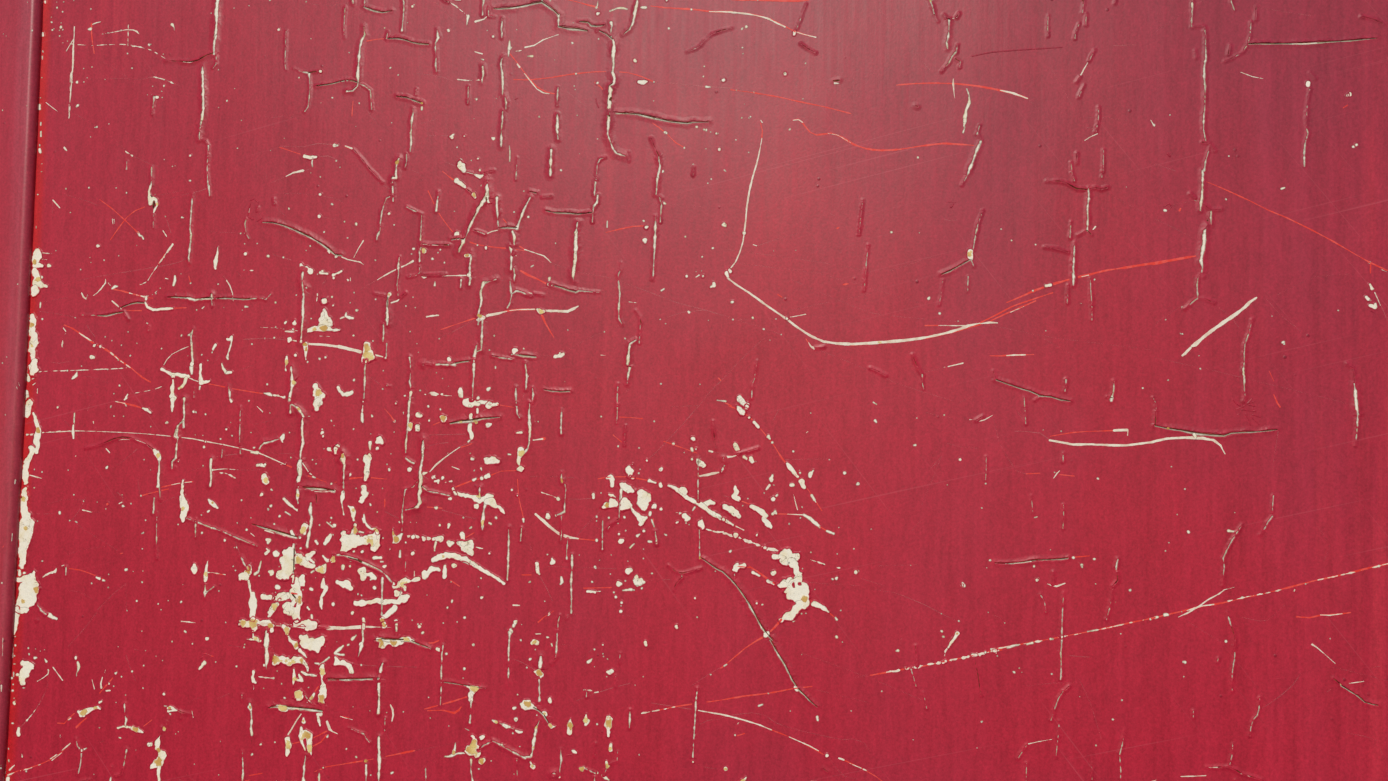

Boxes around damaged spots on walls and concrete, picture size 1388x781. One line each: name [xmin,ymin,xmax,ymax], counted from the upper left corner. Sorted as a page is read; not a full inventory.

peeling [15,246,58,620]
peeling [250,381,355,516]
peeling [283,261,355,372]
crack [72,0,715,781]
peeling [414,386,514,434]
peeling [585,441,838,632]
crack [651,527,822,768]
crack [936,122,987,295]
crack [1041,0,1127,323]
crack [990,316,1283,724]
crack [1181,0,1388,313]
crack [1343,360,1366,449]